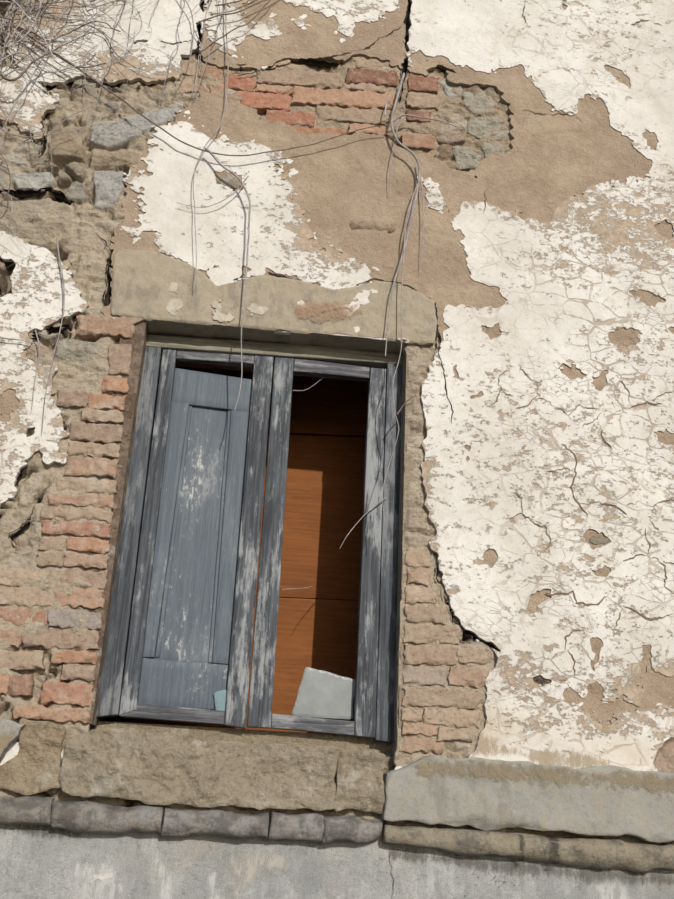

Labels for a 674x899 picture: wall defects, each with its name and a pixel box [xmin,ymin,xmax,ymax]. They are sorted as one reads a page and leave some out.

crack [237,0,413,104]
flaking render [169,0,658,344]
crack [96,234,113,306]
flaking render [101,144,170,325]
crack [494,367,673,449]
flaking render [560,364,608,391]
flaking render [608,328,642,347]
crack [512,493,551,550]
flaking render [584,529,611,550]
crack [545,444,674,627]
crack [434,567,499,652]
flaking render [559,637,674,728]